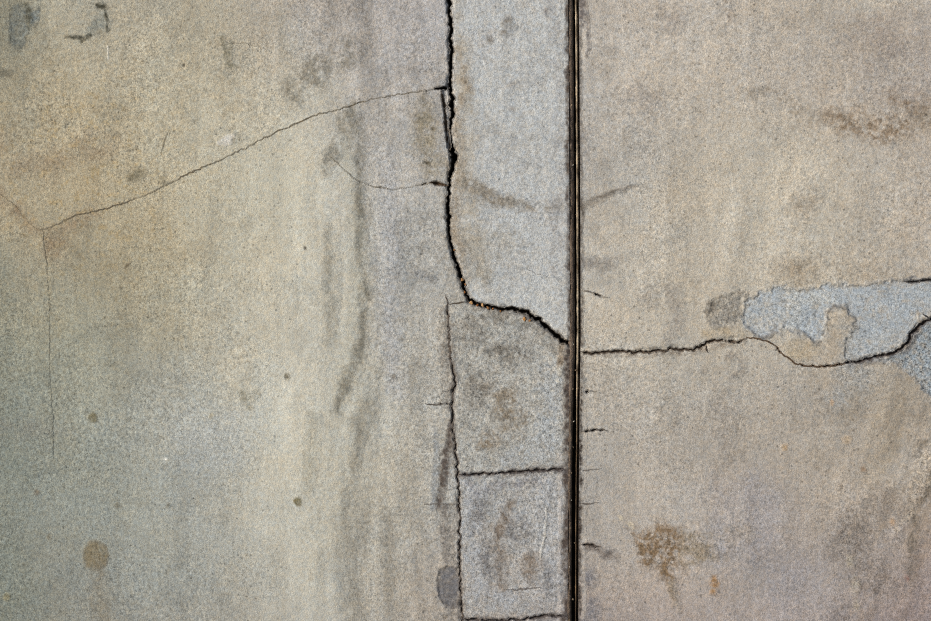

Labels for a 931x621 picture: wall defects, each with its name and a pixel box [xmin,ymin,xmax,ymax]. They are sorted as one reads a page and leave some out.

crack [0,0,574,621]
crack [581,290,610,298]
crack [580,314,931,369]
peeling [702,274,931,401]
corrosion [618,511,721,616]